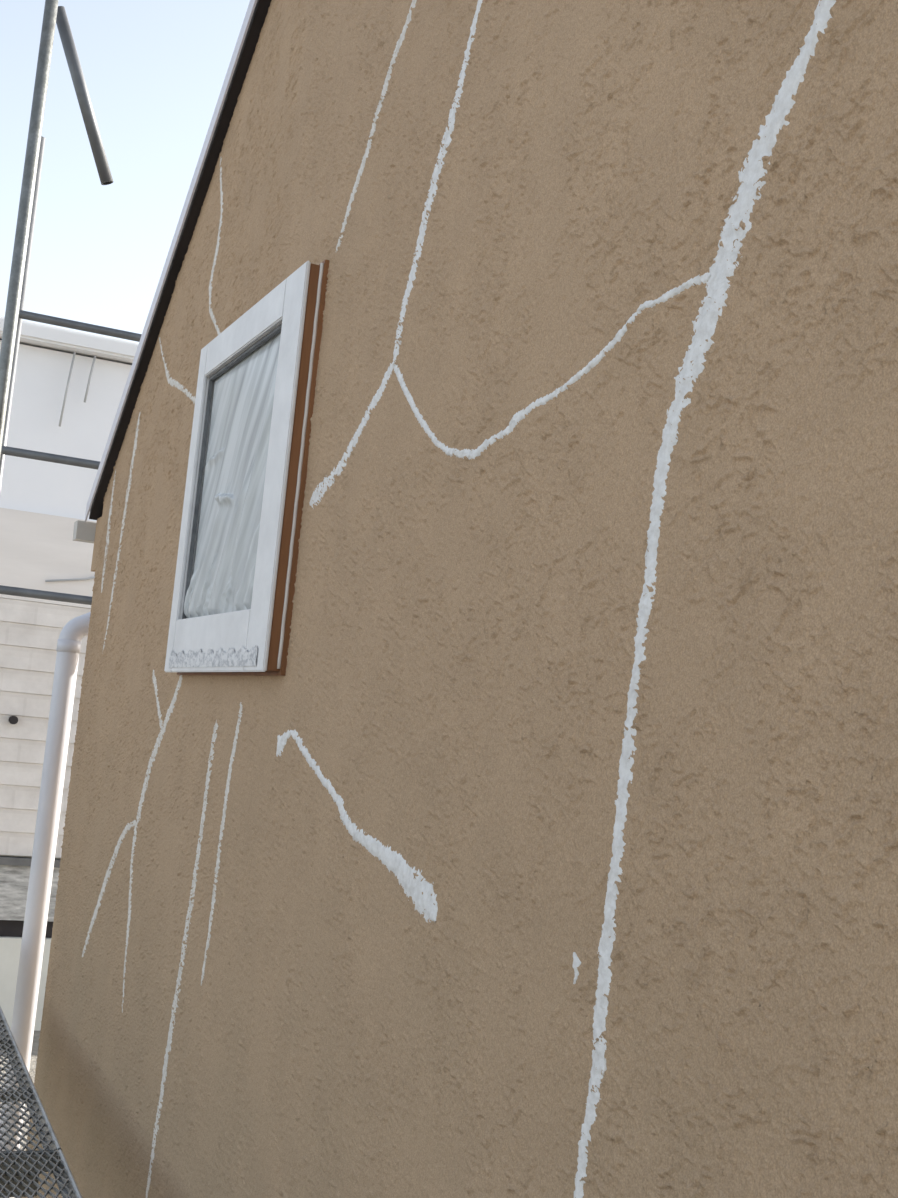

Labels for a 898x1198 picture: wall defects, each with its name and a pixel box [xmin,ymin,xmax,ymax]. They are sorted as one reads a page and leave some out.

crack [82,669,182,1013]
crack [146,702,242,1198]
crack [309,0,836,1198]